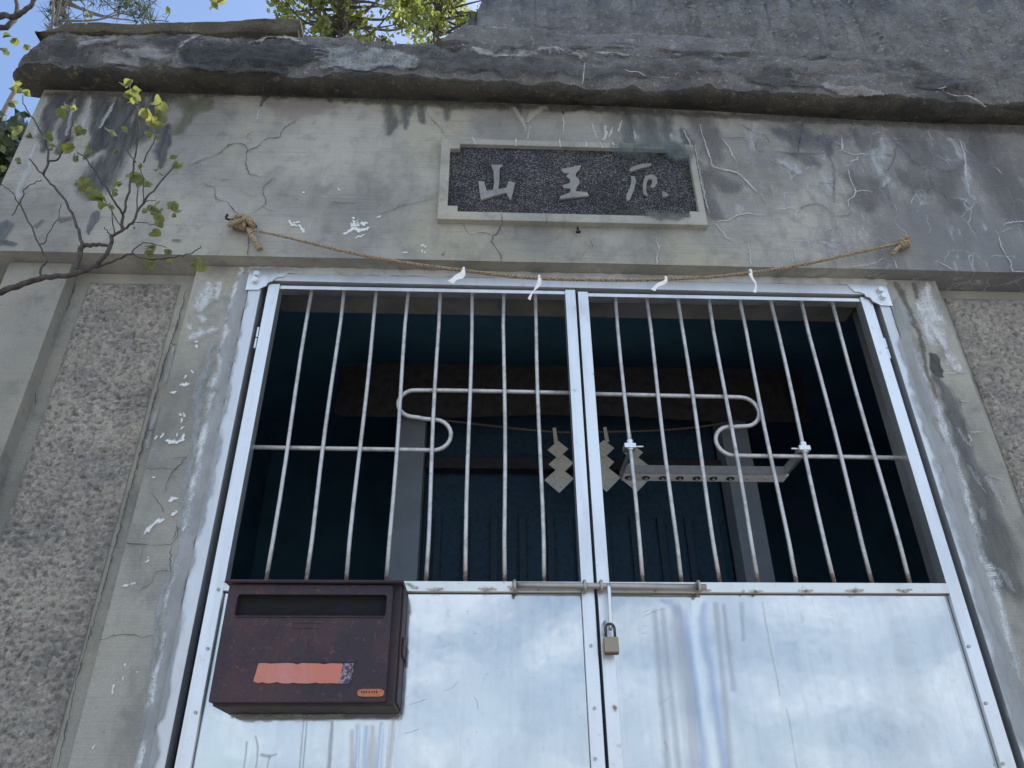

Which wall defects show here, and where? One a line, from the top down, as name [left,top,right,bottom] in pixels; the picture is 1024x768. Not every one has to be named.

leakage [15,91,227,198]
leakage [257,95,1024,221]
crack [188,121,295,255]
crack [683,123,975,264]
leakage [87,210,100,234]
peeling [343,215,381,238]
crack [463,216,503,259]
crack [996,221,1024,272]
peeling [154,413,185,444]
peeling [144,496,178,534]
leakage [894,283,1024,749]